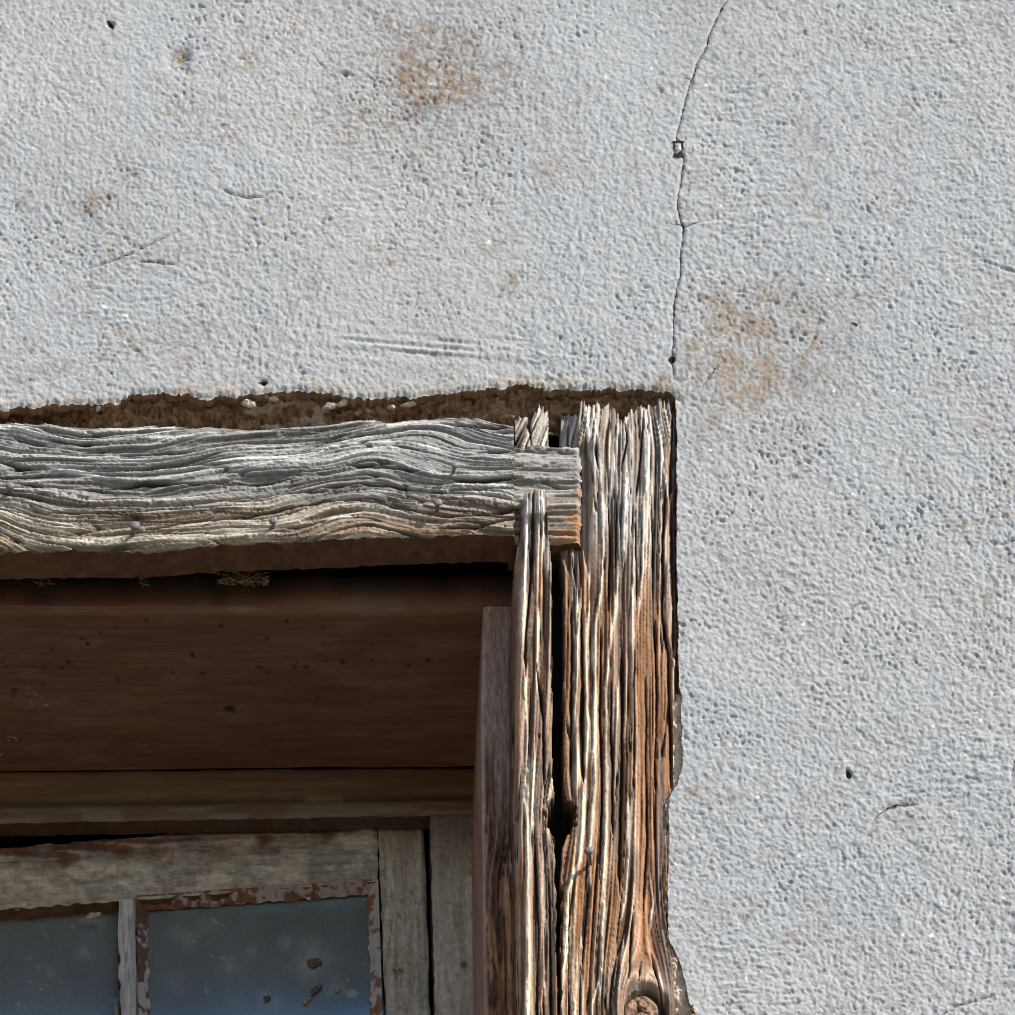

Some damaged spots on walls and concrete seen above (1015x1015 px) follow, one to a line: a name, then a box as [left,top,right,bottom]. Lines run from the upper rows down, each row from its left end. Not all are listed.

crack [666,1,728,377]
spalling [0,382,676,439]
spalling [665,682,683,871]
spalling [665,901,695,1015]